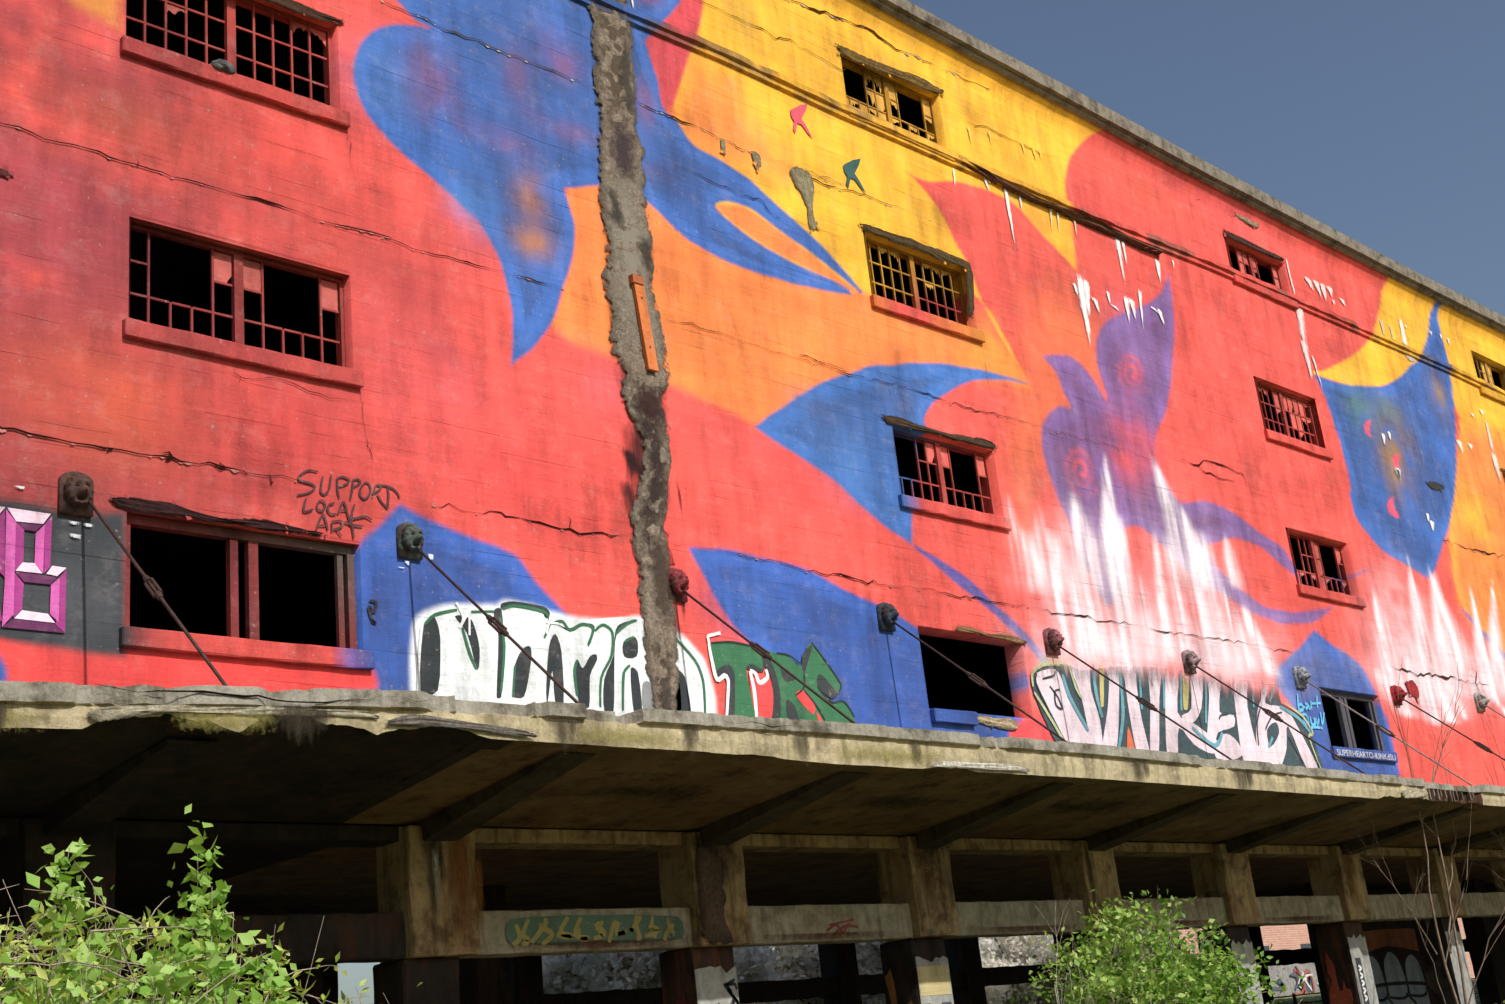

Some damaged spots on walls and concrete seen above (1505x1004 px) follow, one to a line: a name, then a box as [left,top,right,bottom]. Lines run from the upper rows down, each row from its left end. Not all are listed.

crack [0,122,565,289]
peeling [587,0,680,710]
crack [0,426,308,484]
crack [431,503,625,538]